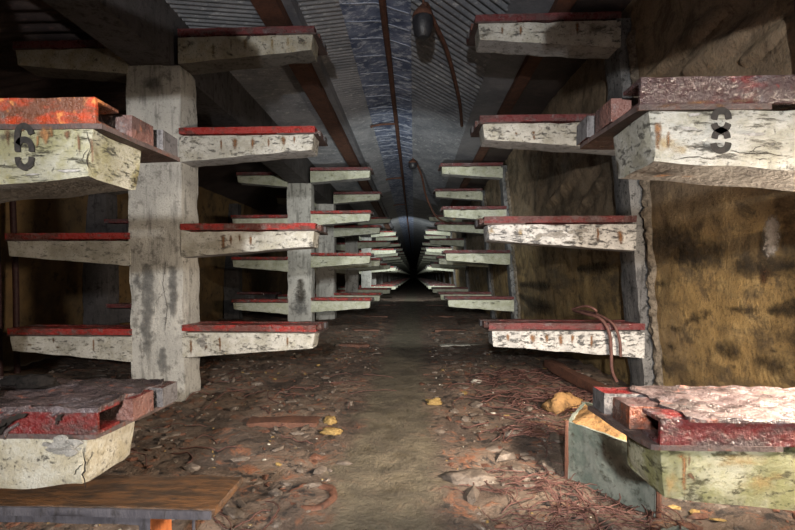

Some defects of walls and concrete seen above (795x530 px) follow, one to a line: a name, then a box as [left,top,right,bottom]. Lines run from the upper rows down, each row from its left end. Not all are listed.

rust [655,124,671,148]
leakage [652,226,723,268]
leakage [737,217,795,283]
leakage [135,264,154,350]
leakage [768,299,795,316]
leakage [158,349,166,371]
leakage [716,342,739,367]
leakage [758,349,783,372]
spalling [42,435,84,457]